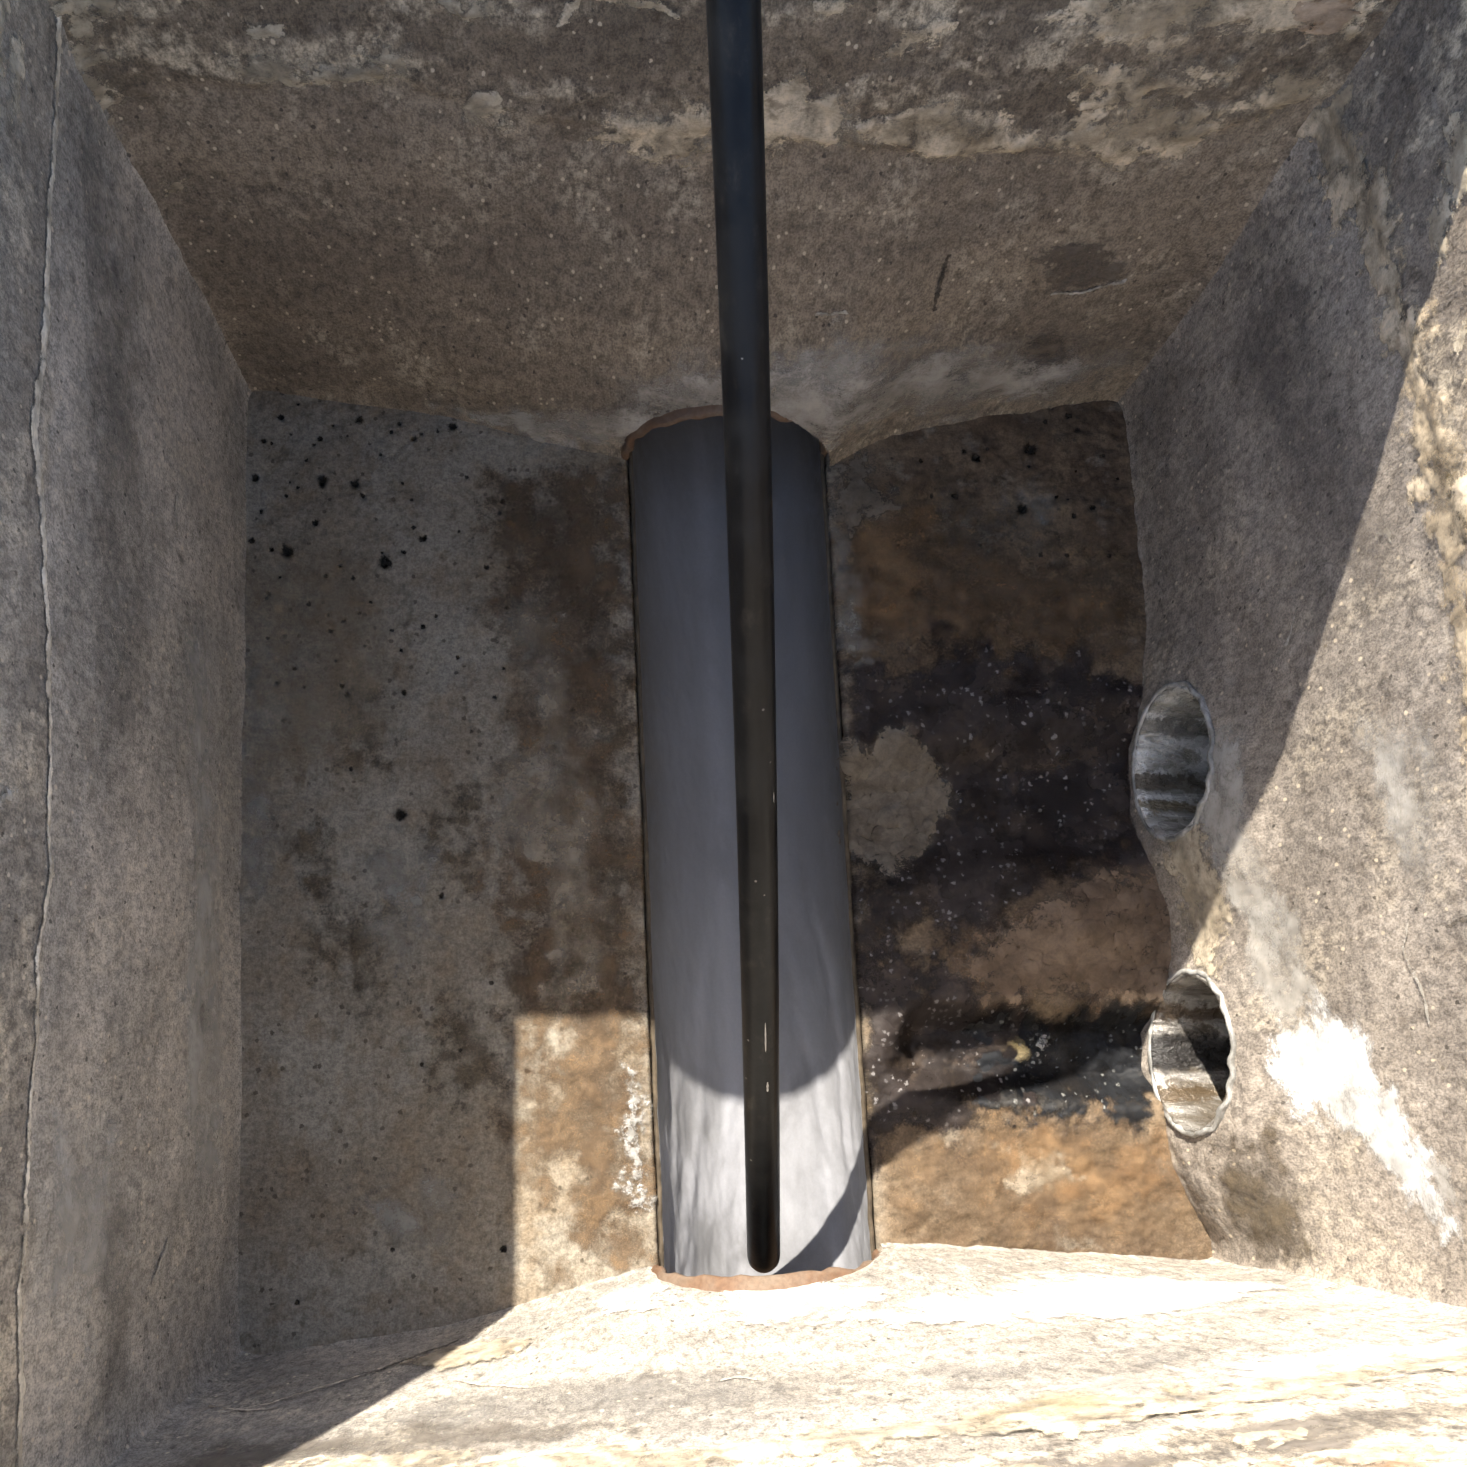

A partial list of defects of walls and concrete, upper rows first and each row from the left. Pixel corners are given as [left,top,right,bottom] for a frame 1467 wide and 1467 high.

crack [17,14,62,1467]
water stain [1163,741,1294,980]
water stain [1376,739,1415,834]
water stain [1221,1157,1310,1259]
water stain [1250,966,1458,1247]